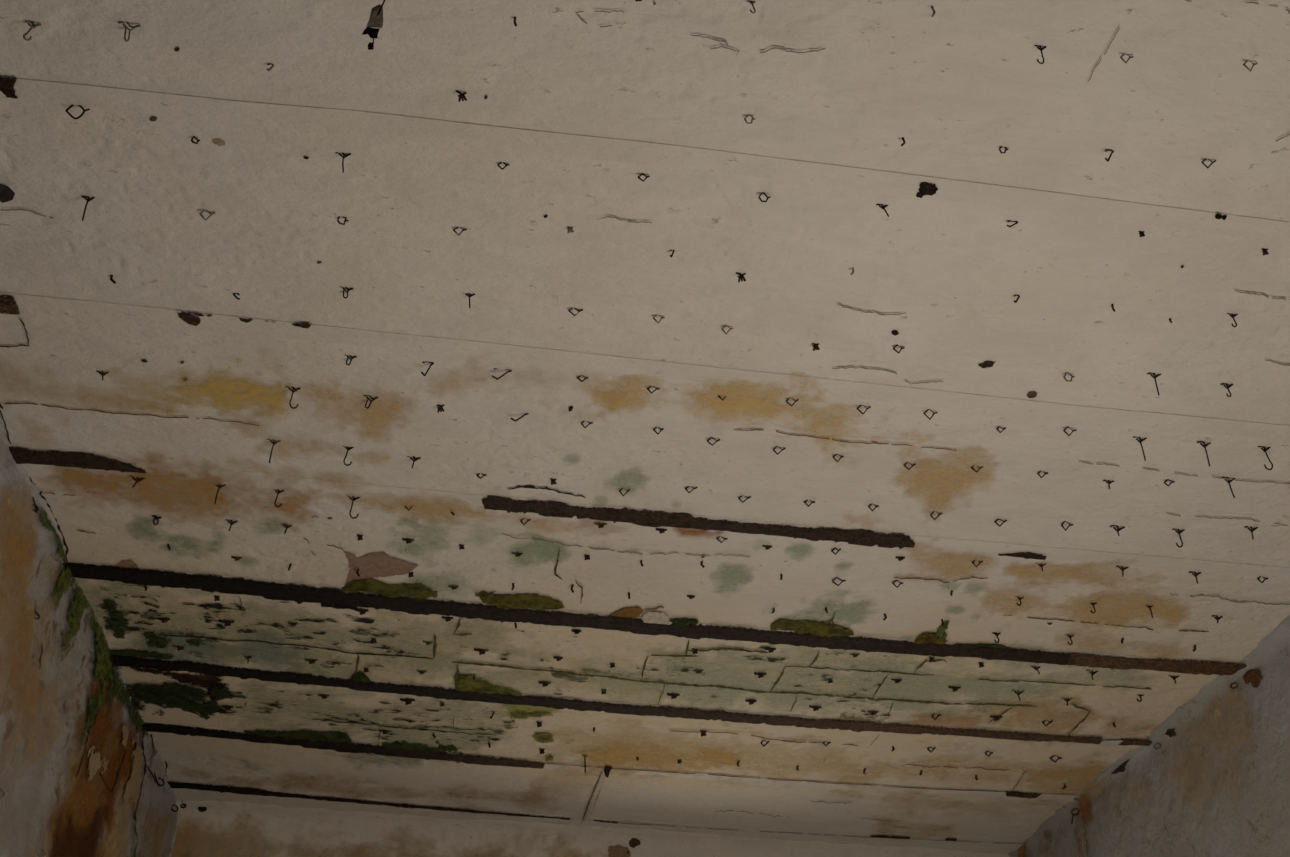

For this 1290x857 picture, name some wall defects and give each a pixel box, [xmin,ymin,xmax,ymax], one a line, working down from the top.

water stain [176,372,286,411]
water stain [692,383,844,441]
water stain [56,459,233,517]
peeling [345,551,418,584]
water stain [1008,566,1183,627]
mould [99,584,425,668]
water stain [539,657,723,700]
water stain [744,647,785,664]
mould [189,679,515,751]